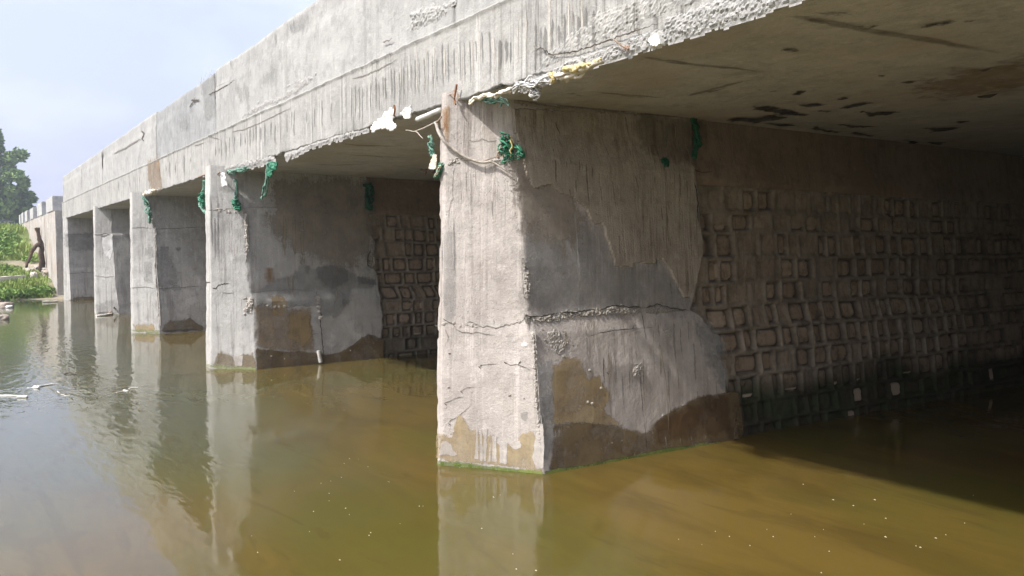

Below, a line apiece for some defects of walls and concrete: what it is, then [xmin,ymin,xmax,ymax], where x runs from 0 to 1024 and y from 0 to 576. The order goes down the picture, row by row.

leakage [214,335,384,369]
crack [442,319,524,341]
crack [587,312,656,379]
leakage [532,330,744,470]
leakage [439,441,457,456]
leakage [474,428,521,464]